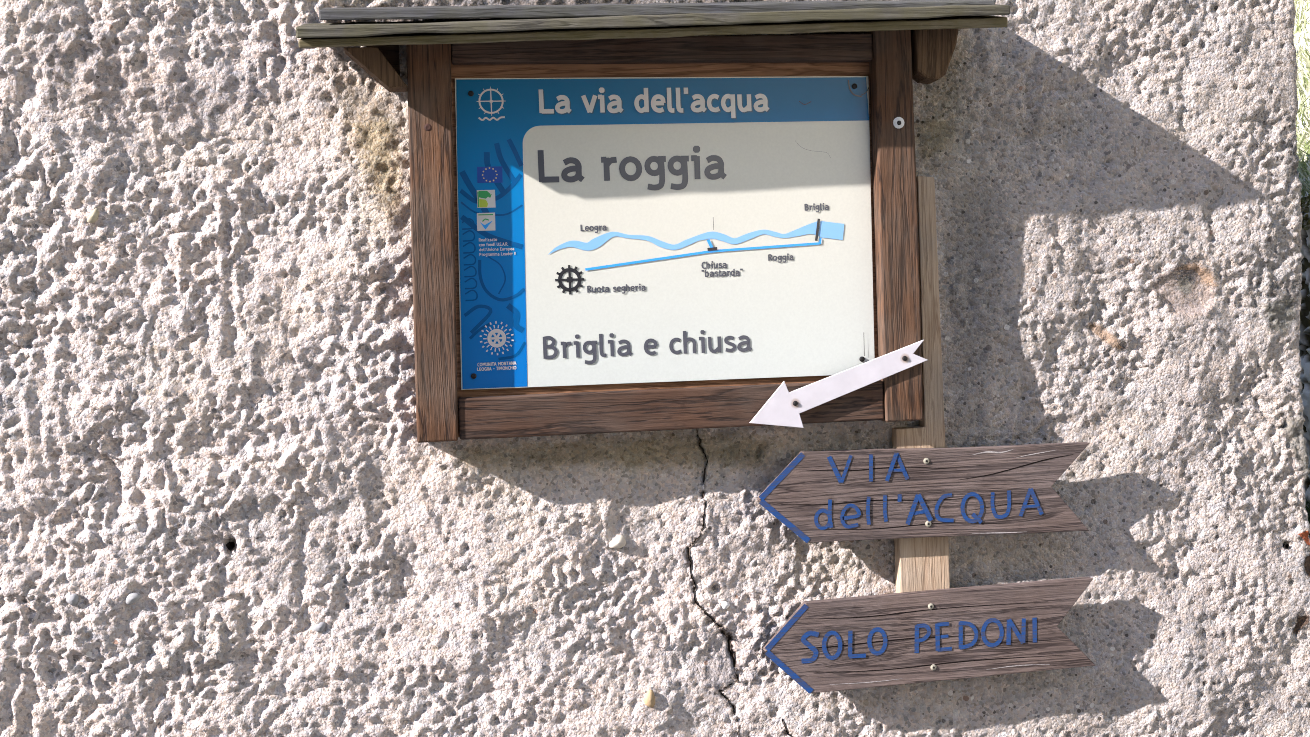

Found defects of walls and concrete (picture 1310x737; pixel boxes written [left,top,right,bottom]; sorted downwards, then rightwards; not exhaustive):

crack [687,430,740,735]